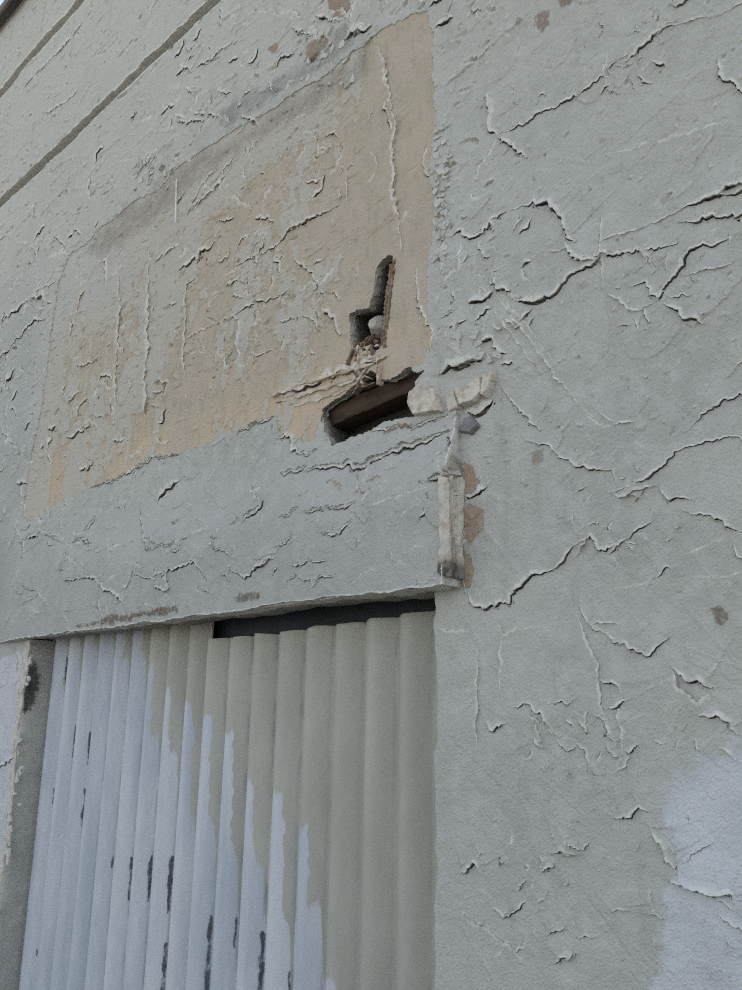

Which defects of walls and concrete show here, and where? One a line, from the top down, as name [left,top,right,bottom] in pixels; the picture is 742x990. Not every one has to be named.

crack [23,10,91,89]
crack [39,88,79,115]
crack [0,280,55,358]
peeling [0,0,534,588]
crack [67,0,742,592]
crack [0,389,384,610]
crack [439,520,651,776]
crack [576,603,742,761]
crack [0,755,13,769]
spalling [523,696,637,777]
peeling [204,915,212,990]